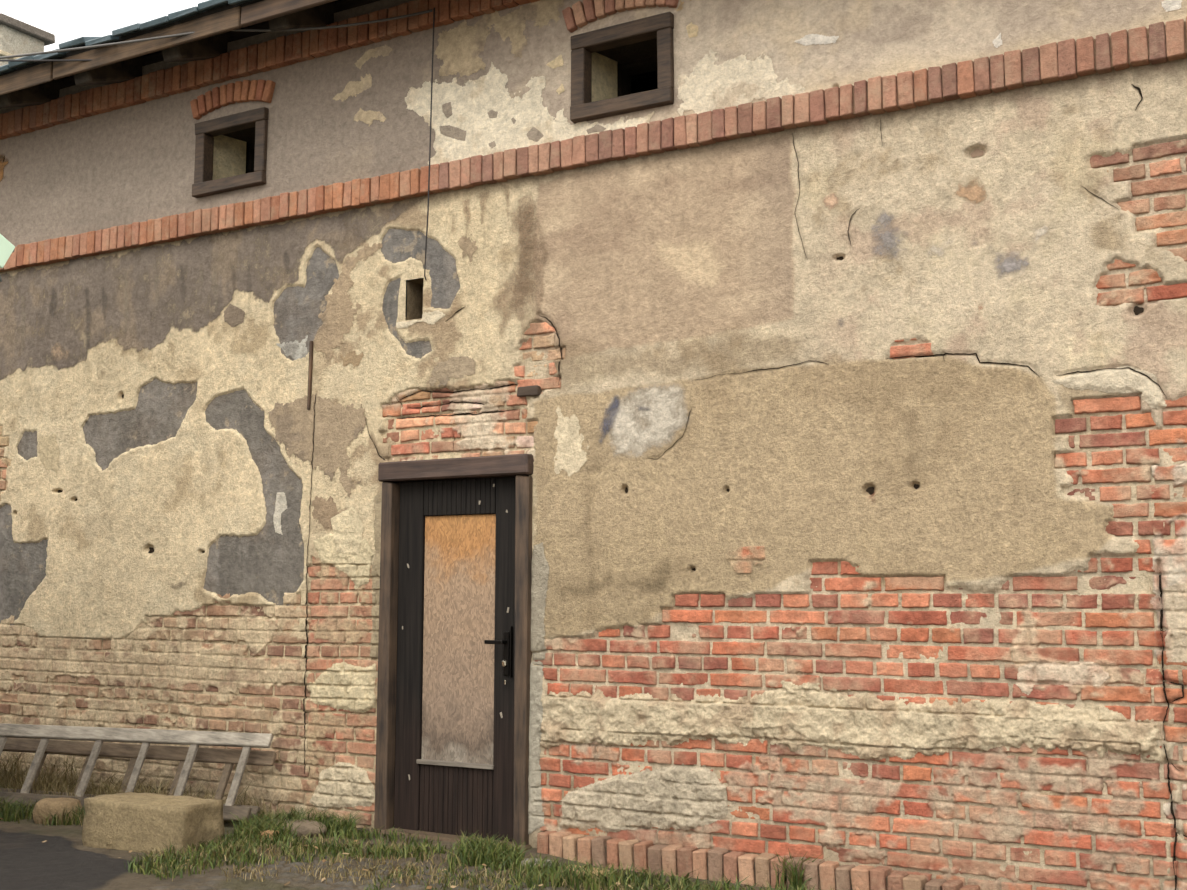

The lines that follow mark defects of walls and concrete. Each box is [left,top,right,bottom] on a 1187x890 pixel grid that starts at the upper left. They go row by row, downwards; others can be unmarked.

flaking render [405,0,654,165]
crack [1132,84,1143,110]
crack [792,134,806,255]
flaking render [1090,139,1187,261]
flaking render [273,228,478,369]
flaking render [1096,259,1187,315]
flaking render [381,278,566,461]
crack [887,353,1167,398]
flaking render [0,378,378,828]
flaking render [535,396,1187,890]
crack [1159,575,1187,890]